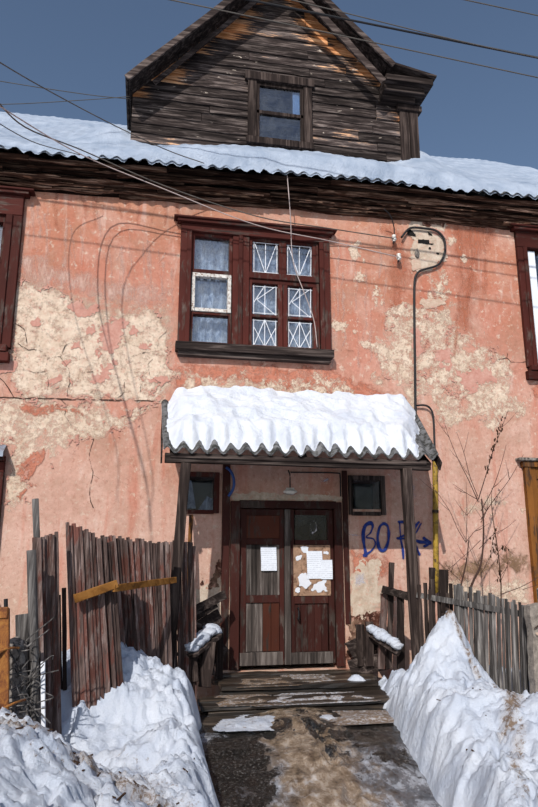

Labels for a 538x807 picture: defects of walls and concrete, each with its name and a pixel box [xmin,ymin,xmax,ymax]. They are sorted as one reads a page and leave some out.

crack [0,323,167,425]
peeling [0,215,526,511]
spalling [345,550,389,661]